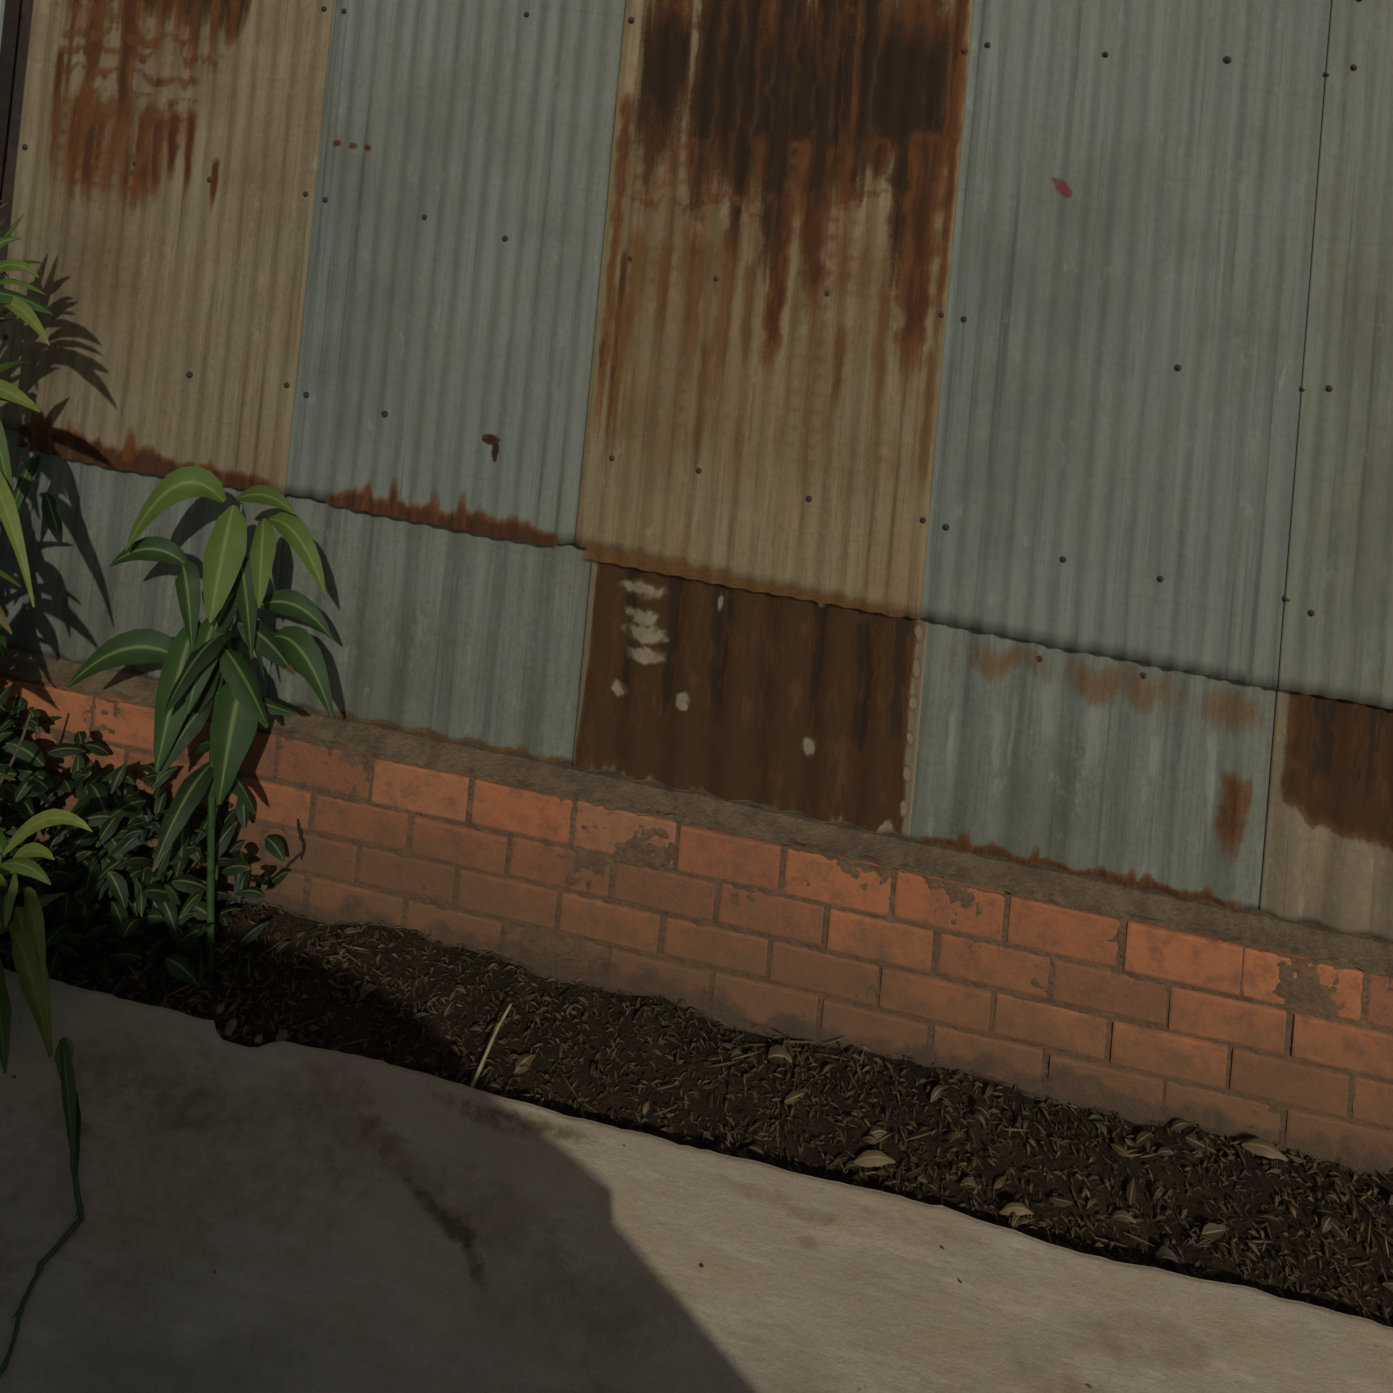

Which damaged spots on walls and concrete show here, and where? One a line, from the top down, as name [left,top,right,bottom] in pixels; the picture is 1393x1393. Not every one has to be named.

corrosion [50,0,250,205]
corrosion [597,0,969,479]
corrosion [16,414,269,489]
corrosion [482,434,500,462]
corrosion [327,484,557,547]
peeling [620,579,669,665]
corrosion [306,544,917,834]
peeling [611,679,626,697]
peeling [676,692,690,711]
peeling [802,737,815,756]
corrosion [1281,691,1393,851]
corrosion [1217,776,1252,851]